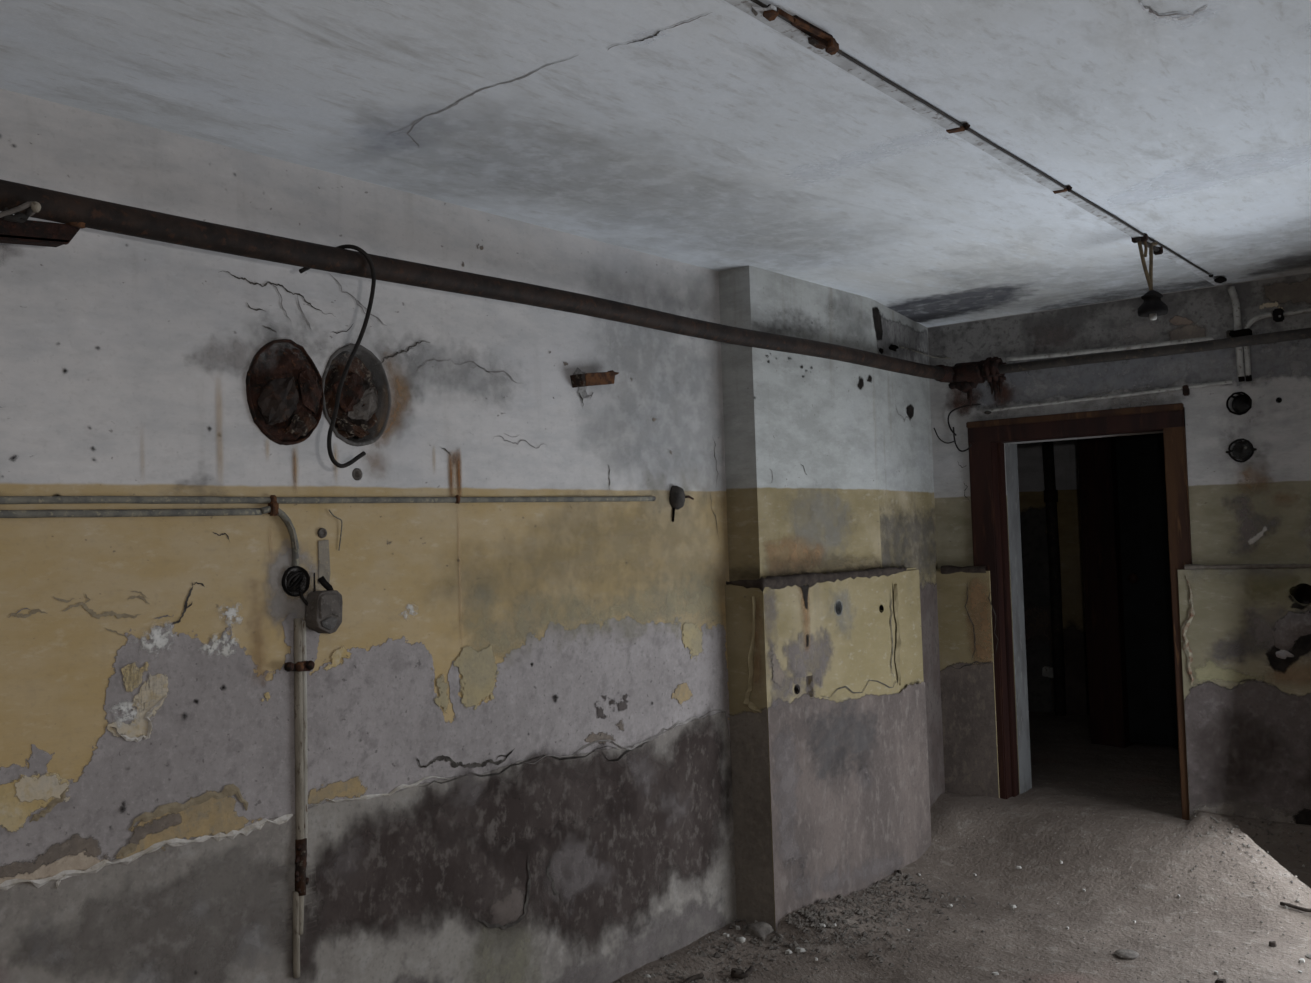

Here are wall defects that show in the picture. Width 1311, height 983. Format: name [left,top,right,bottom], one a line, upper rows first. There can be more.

crack [608,12,712,50]
crack [388,55,578,147]
crack [218,271,516,383]
corrosion [442,448,461,495]
crack [8,582,205,636]
leakage [112,702,137,728]
peeling [0,613,737,983]
crack [417,748,515,768]
peeling [768,583,999,930]
peeling [1181,577,1311,825]
leakage [23,707,775,983]